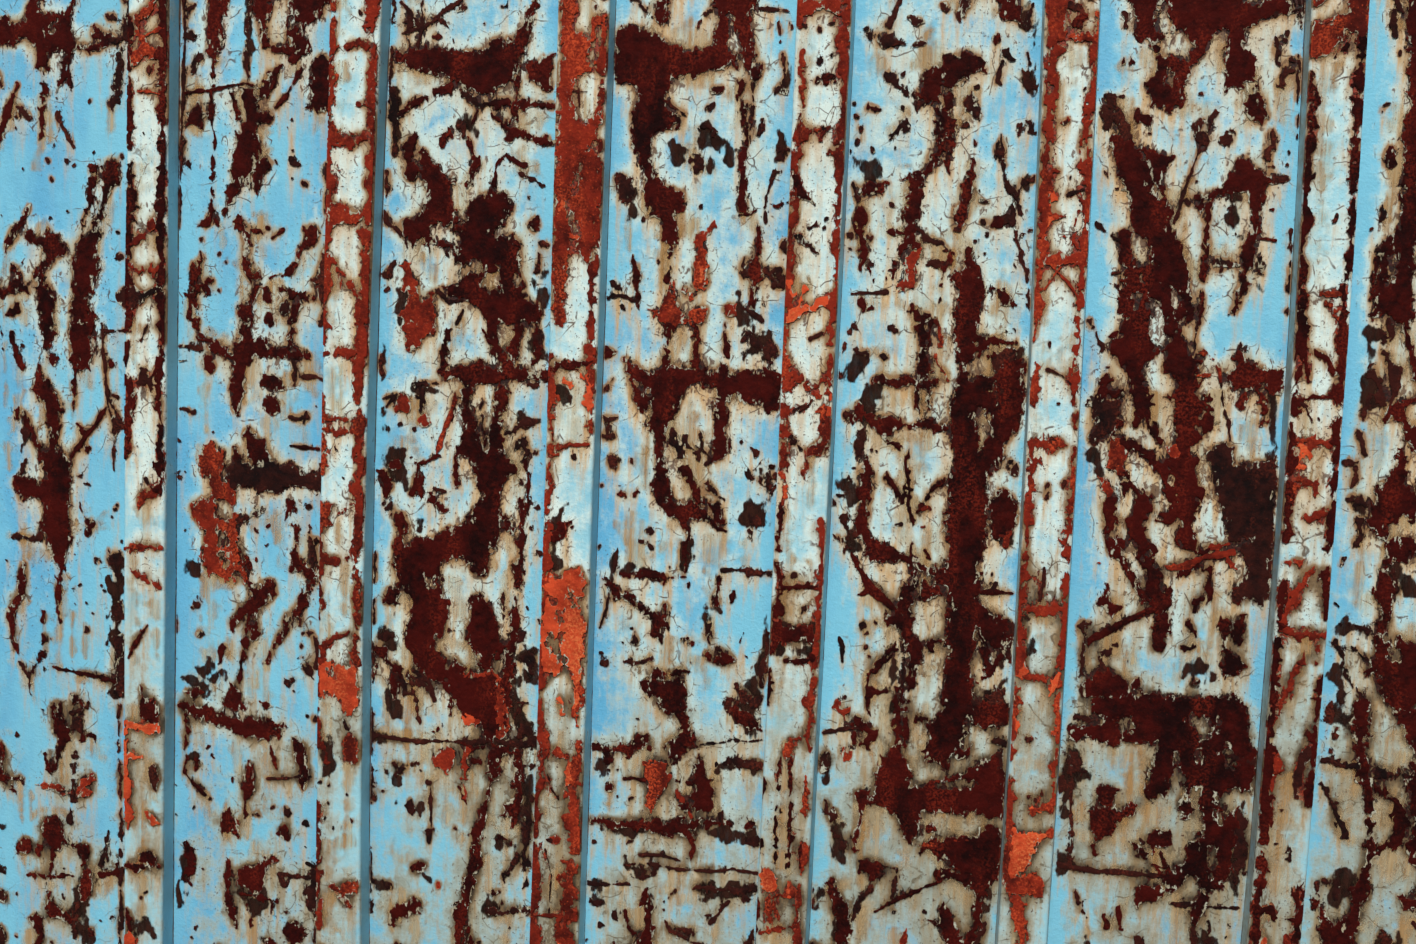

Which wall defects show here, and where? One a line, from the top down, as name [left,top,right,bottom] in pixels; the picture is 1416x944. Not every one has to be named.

peeling [1046,0,1099,42]
peeling [1275,0,1370,97]
peeling [826,101,882,157]
peeling [792,174,829,254]
rust [0,0,1066,944]
peeling [555,373,614,412]
peeling [739,370,850,500]
rust [1046,0,1416,944]
peeling [775,572,818,665]
peeling [252,644,360,849]
peeling [1259,558,1354,944]
peeling [1002,790,1051,944]